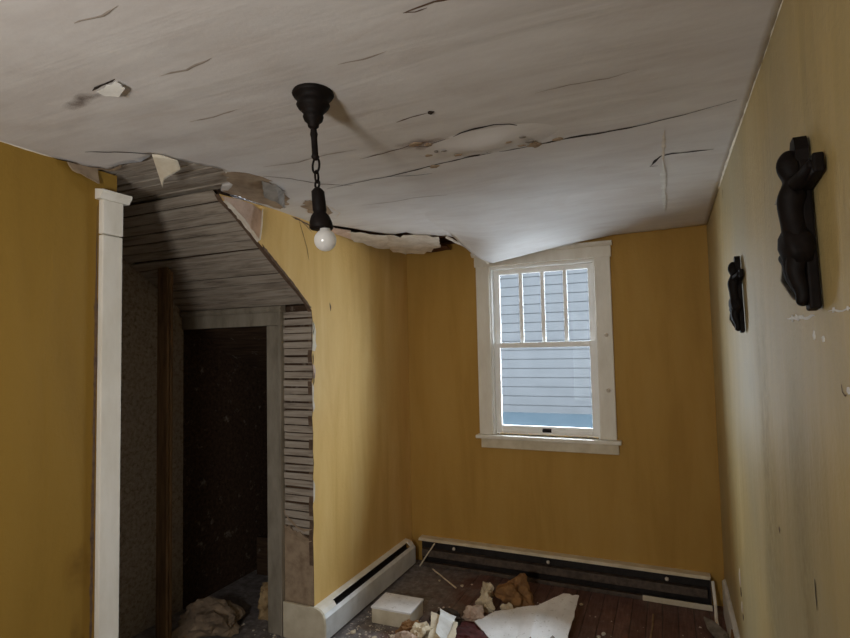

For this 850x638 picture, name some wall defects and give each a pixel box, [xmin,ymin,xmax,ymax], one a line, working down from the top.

crack [404,0,446,13]
peeling [92,79,125,97]
crack [266,100,735,189]
flaking render [54,158,122,184]
peeling [101,152,180,187]
peeling [221,172,290,209]